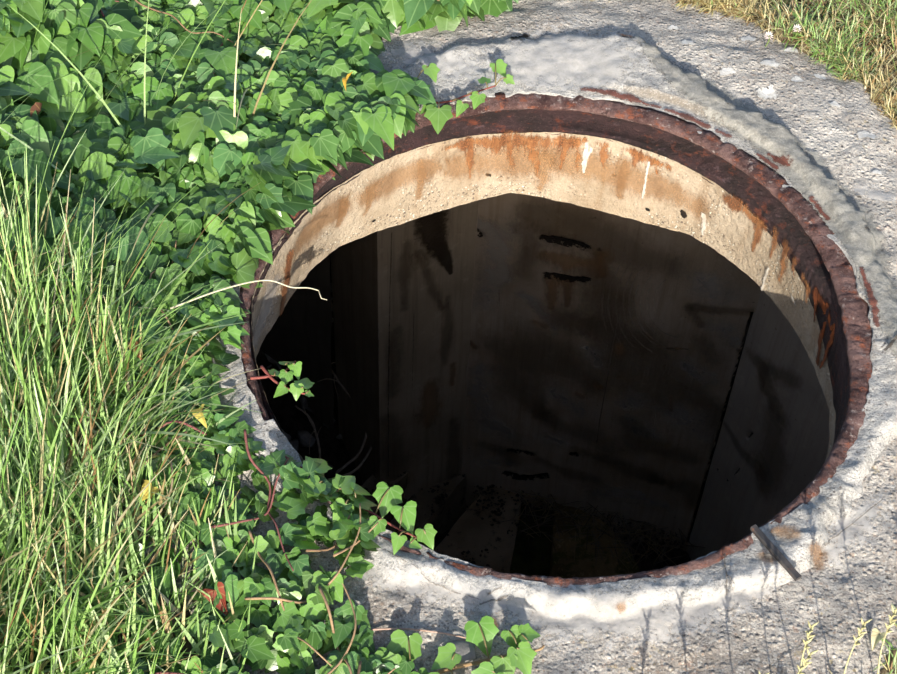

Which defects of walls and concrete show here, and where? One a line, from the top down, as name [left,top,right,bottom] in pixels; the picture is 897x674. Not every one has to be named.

corrosion [580,87,732,138]
corrosion [361,131,703,215]
corrosion [757,153,793,171]
corrosion [280,198,349,316]
water stain [414,210,453,275]
corrosion [723,194,835,369]
corrosion [860,267,880,327]
corrosion [811,545,823,569]